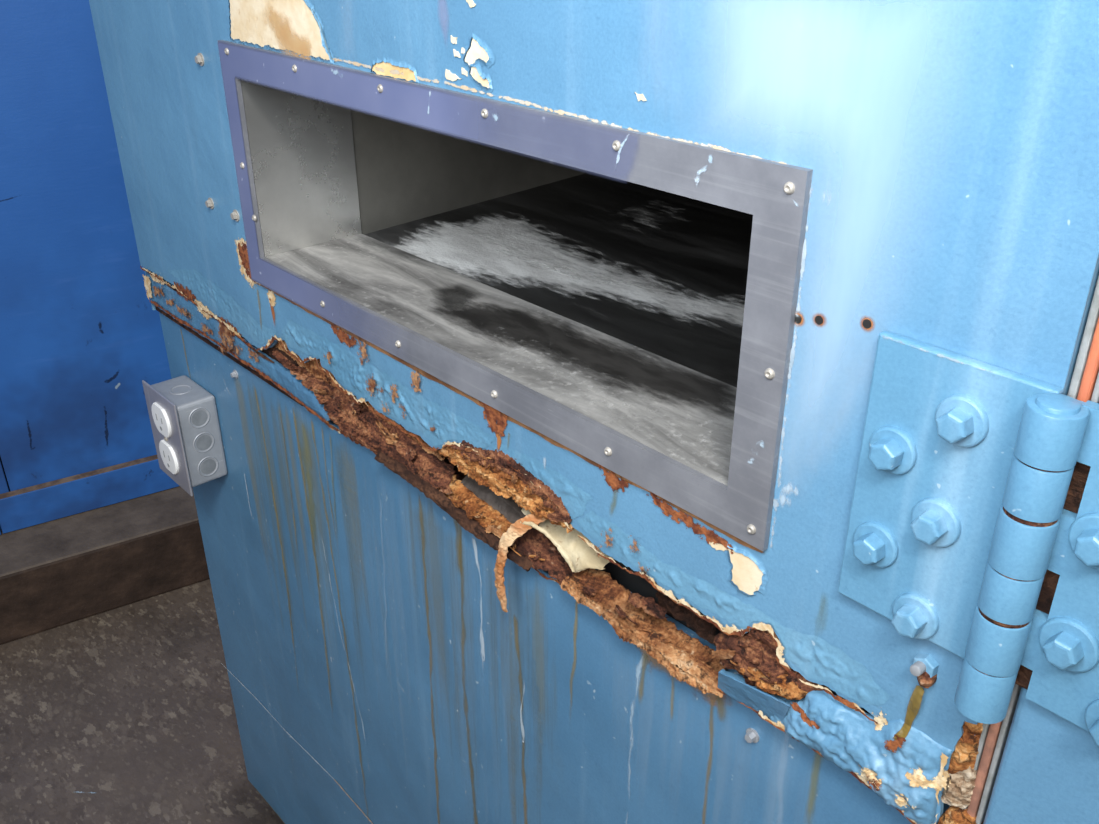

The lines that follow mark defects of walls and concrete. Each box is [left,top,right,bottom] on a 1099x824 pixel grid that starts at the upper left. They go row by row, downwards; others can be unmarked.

peeling [228,0,335,65]
peeling [370,57,419,83]
peeling [445,32,495,93]
corrosion [140,238,878,824]
peeling [709,541,769,597]
water stain [630,654,646,750]
corrosion [884,685,924,753]
corrosion [934,722,984,824]